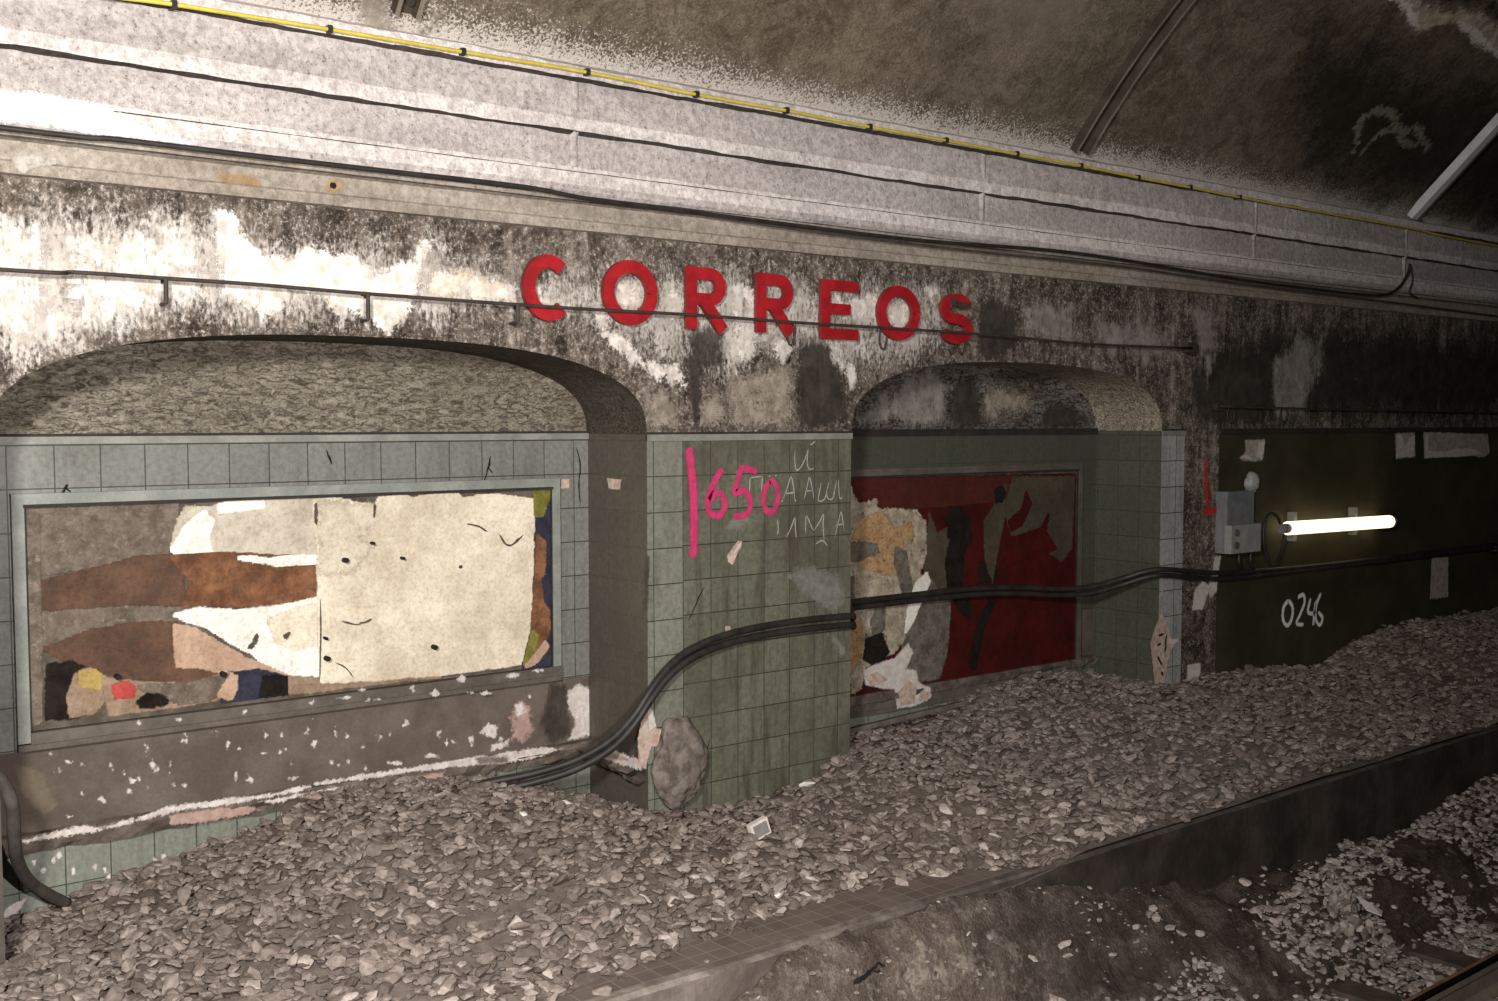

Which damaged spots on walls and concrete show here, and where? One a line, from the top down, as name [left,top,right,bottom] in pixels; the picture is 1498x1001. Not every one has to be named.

water stain [1389,0,1498,58]
water stain [1295,19,1498,232]
water stain [0,189,1087,429]
spalling [1150,562,1179,684]
peeling [1187,663,1201,681]
peeling [22,684,589,875]
spalling [606,708,662,771]